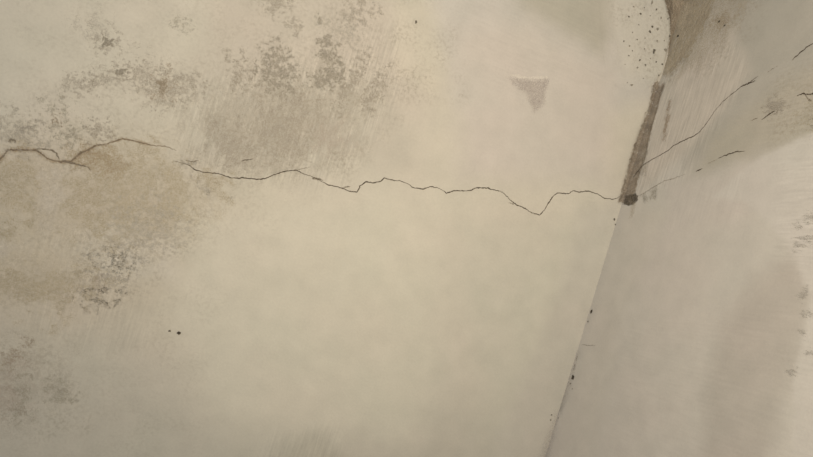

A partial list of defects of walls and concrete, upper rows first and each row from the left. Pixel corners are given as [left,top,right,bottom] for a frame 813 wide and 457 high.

water stain [0,0,395,443]
crack [0,68,773,215]